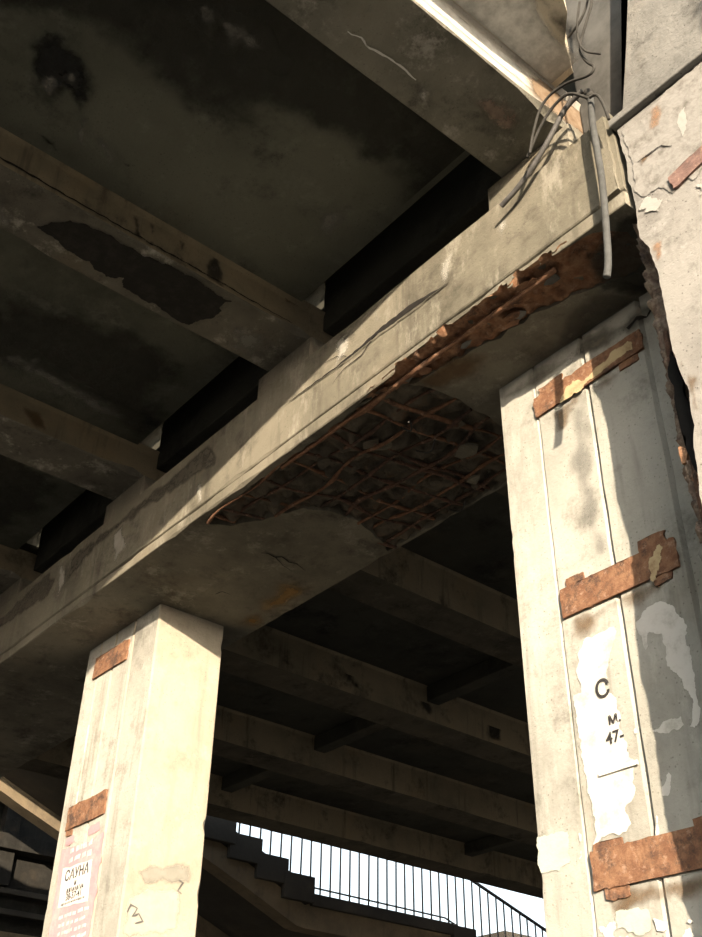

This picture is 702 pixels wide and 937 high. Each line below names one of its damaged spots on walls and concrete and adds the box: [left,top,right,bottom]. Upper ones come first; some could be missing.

peeling [621,61,702,213]
spalling [37,220,232,325]
crack [289,283,448,401]
spalling [206,231,617,549]
corrosion [528,370,553,385]
peeling [560,341,632,403]
corrosion [576,306,650,355]
spalling [633,224,702,561]
peeling [648,544,663,582]
corrosion [576,616,593,631]
corrosion [616,889,654,910]
corrosion [671,879,702,895]